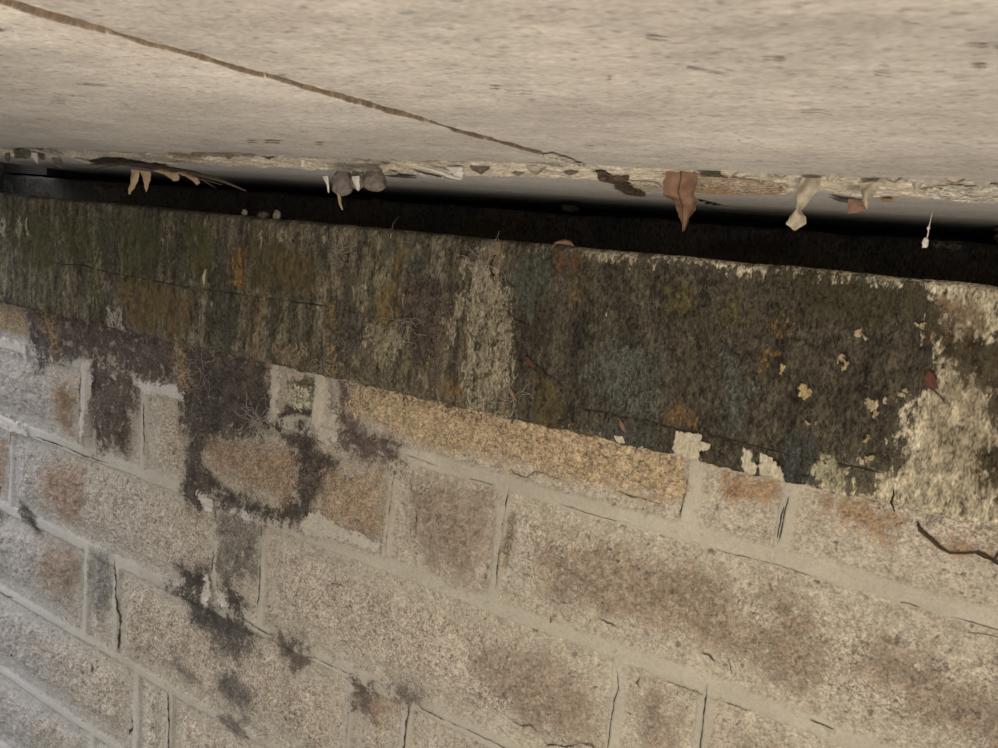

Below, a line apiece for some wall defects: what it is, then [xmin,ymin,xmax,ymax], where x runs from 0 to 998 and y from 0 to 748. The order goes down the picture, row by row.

peeling [4,148,91,168]
peeling [413,165,491,182]
spalling [593,170,662,197]
peeling [695,170,788,196]
peeling [884,177,998,203]
damp [0,216,29,244]
damp [433,243,516,428]
damp [21,305,409,538]
damp [806,453,848,494]
damp [163,558,311,744]